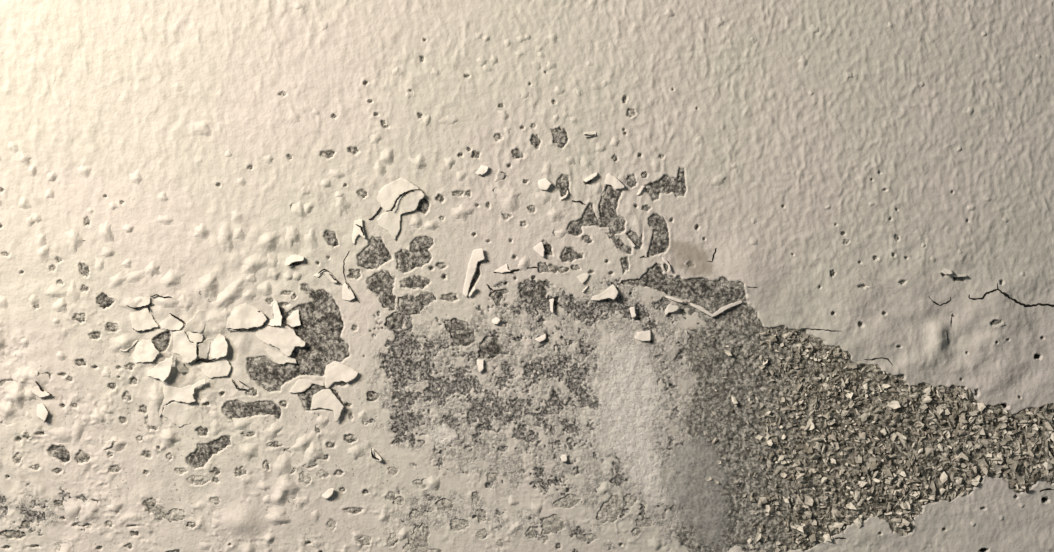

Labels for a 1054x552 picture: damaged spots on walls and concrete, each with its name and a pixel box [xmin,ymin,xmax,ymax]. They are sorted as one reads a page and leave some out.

spalling [80,169,1054,552]
crack [929,283,1054,341]